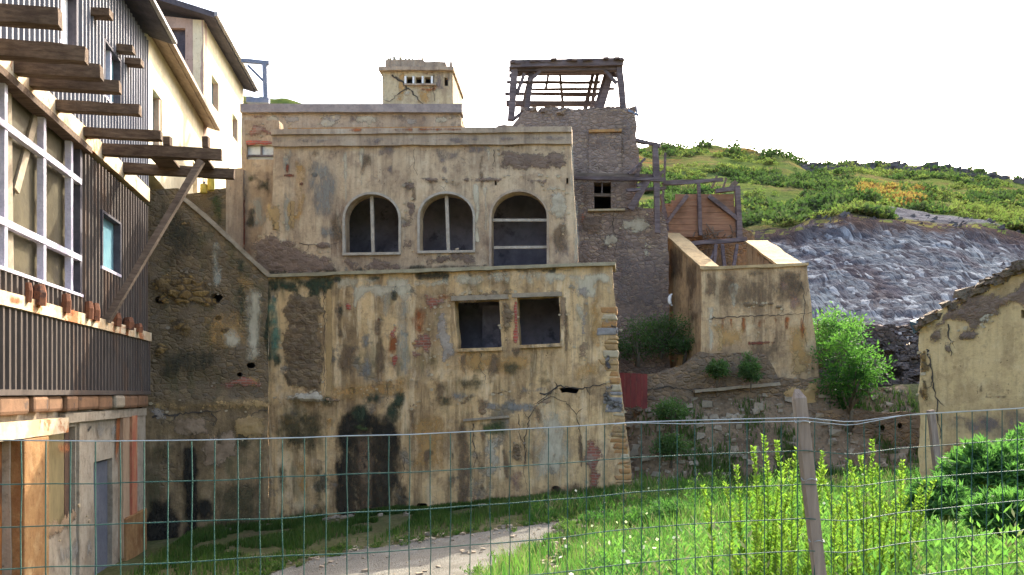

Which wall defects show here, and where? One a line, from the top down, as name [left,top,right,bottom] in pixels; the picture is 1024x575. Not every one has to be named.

crack [385,75,437,104]
peeling [497,145,566,187]
spalling [250,201,400,273]
spalling [278,293,340,403]
spalling [412,289,519,366]
water stain [669,249,803,349]
crack [709,282,812,347]
crack [926,324,954,438]
spalling [916,281,1024,400]
water stain [187,473,214,531]
water stain [335,437,398,513]
crack [518,383,605,493]